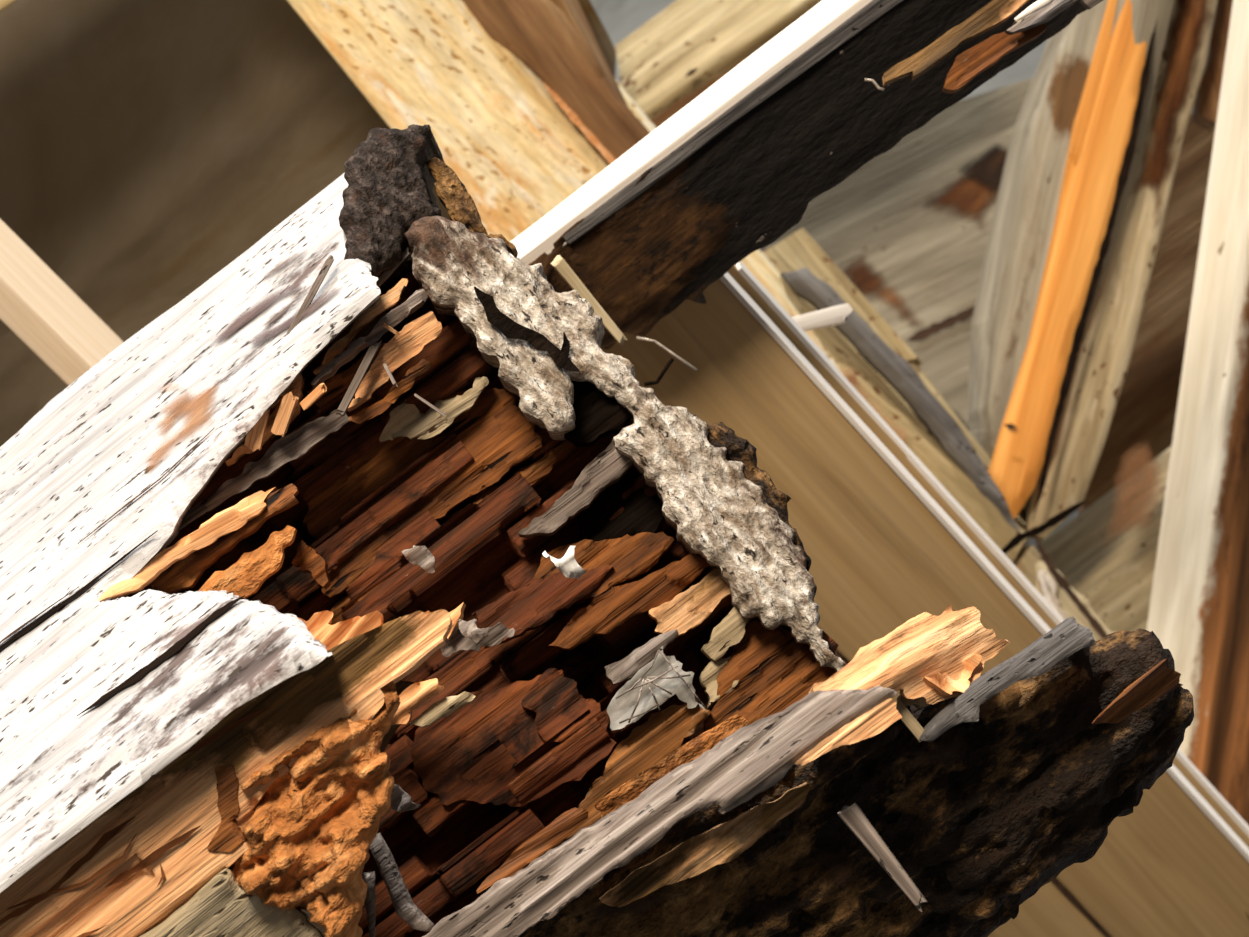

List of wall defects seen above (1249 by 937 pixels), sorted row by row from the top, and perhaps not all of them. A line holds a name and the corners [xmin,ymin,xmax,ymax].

crack [78,428,214,544]
crack [0,530,158,650]
peeling [1038,569,1069,620]
crack [76,595,245,717]
crack [177,706,272,758]
spalling [207,765,246,852]
crack [0,816,200,924]
crack [77,924,109,937]